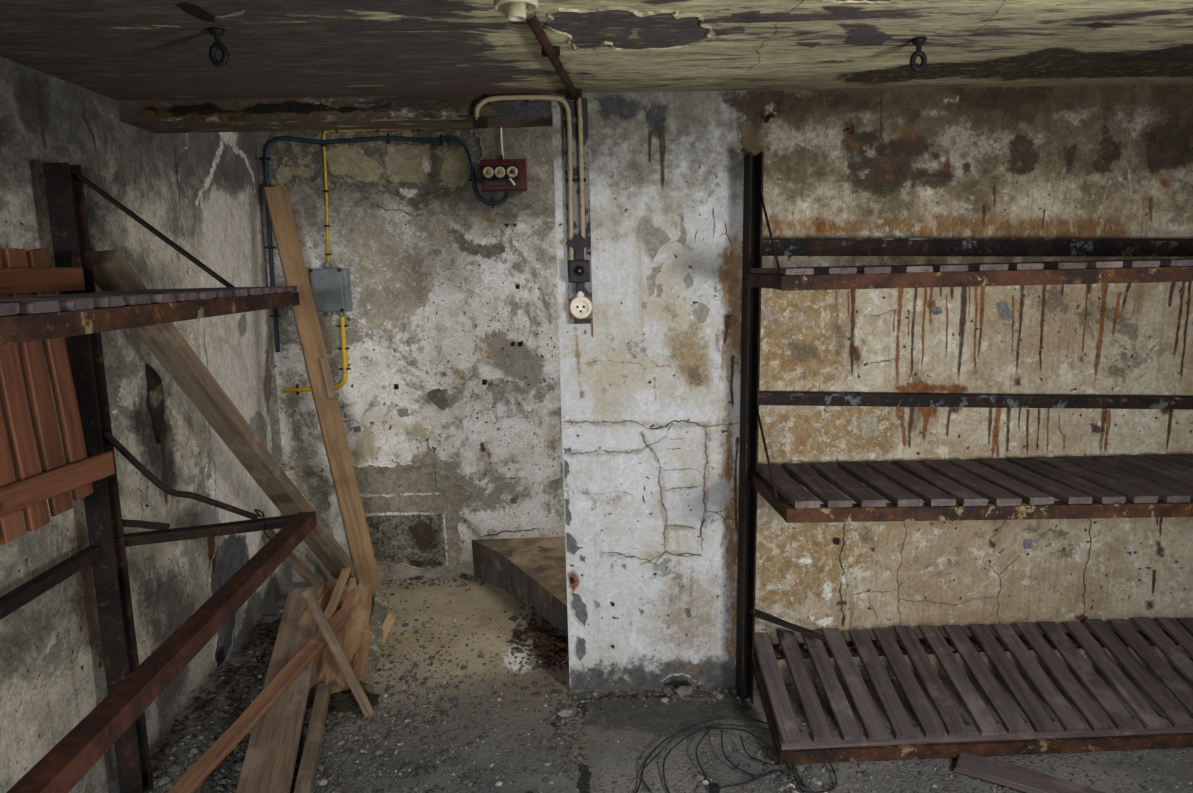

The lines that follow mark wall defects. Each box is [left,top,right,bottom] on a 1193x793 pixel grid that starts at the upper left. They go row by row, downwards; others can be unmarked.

peeling [543,0,789,51]
efflorescence [195,132,256,214]
peeling [264,109,485,213]
water stain [723,44,1193,217]
peeling [444,225,505,259]
corrosion [716,236,743,406]
corrosion [823,289,864,374]
corrosion [893,286,986,393]
water stain [112,378,140,414]
spalling [353,442,473,576]
crack [563,420,739,565]
corrosion [721,428,739,660]